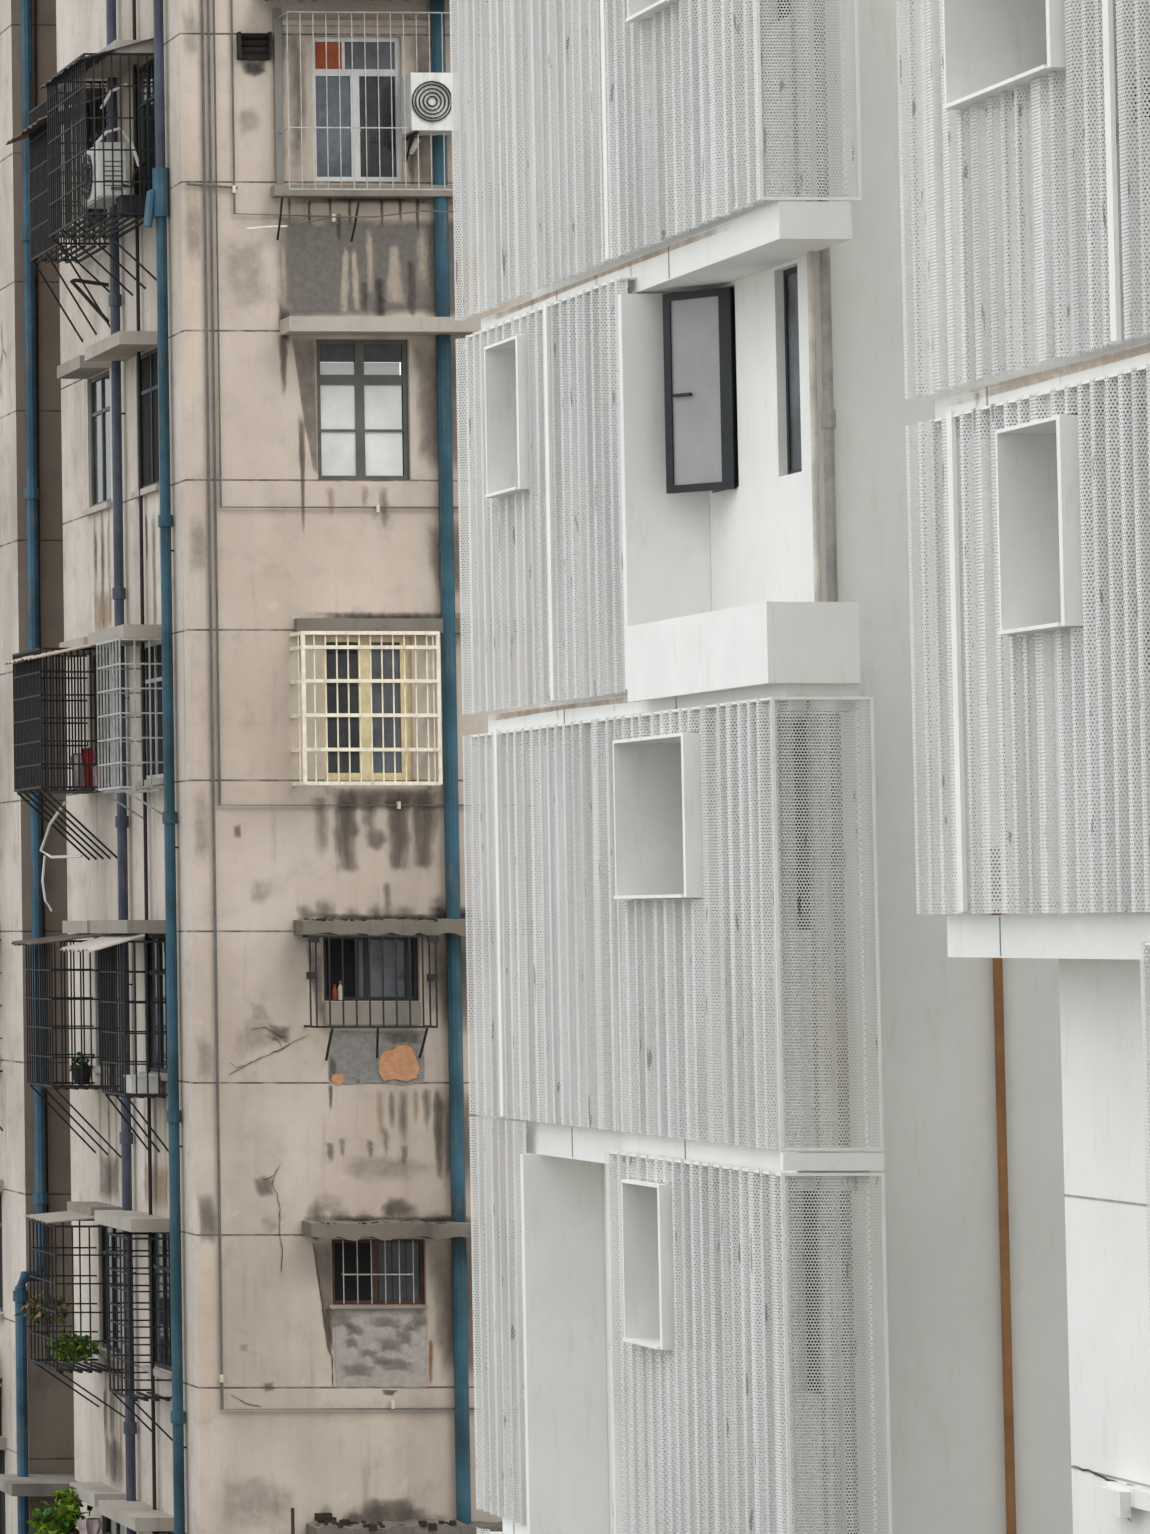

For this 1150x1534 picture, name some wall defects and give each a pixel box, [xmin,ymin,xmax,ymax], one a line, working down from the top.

leakage [280,198,476,510]
leakage [336,791,433,868]
crack [229,1027,308,1075]
peeling [328,1031,425,1085]
leakage [425,1094,475,1172]
crack [264,1163,333,1384]